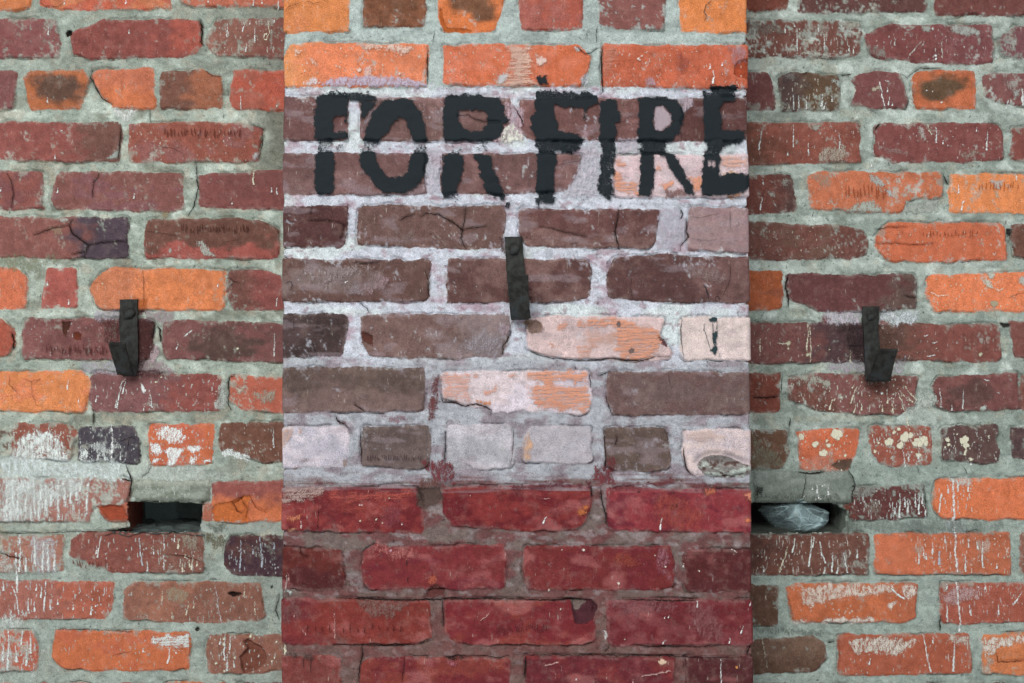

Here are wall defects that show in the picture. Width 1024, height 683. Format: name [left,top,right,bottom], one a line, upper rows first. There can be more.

crack [38,220,127,258]
crack [402,207,486,248]
spalling [99,494,251,537]
hole [751,502,849,535]